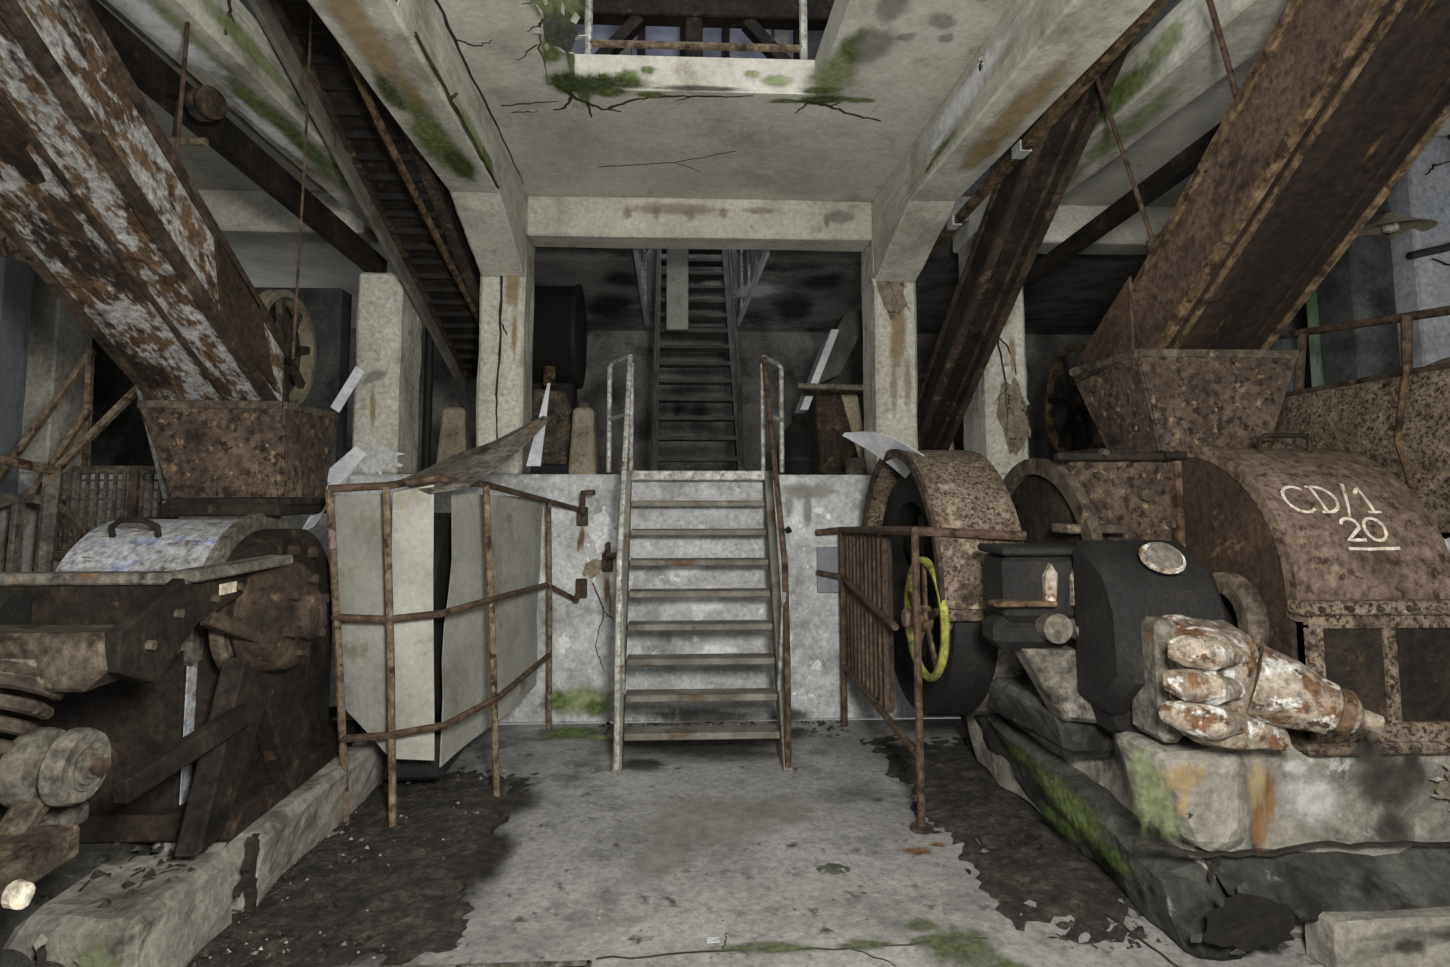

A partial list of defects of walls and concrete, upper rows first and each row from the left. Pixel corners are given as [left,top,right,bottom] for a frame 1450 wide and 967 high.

leakage [114,0,225,75]
leakage [858,0,912,59]
leakage [932,15,954,42]
rust [0,102,88,244]
leakage [234,97,307,163]
crack [1425,134,1450,175]
rust [507,275,518,353]
rust [892,311,904,363]
rust [1250,765,1275,845]